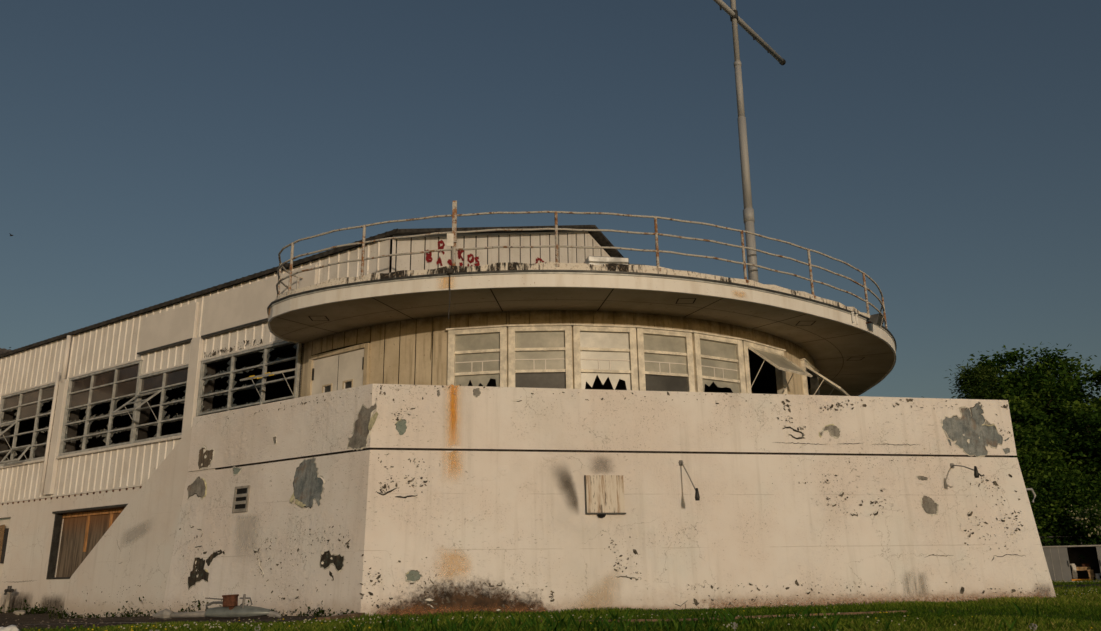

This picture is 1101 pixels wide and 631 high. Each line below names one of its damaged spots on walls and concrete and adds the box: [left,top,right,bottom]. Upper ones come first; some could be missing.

peeling [347,385,455,450]
peeling [746,393,867,439]
peeling [941,400,1012,458]
peeling [187,445,215,500]
peeling [289,457,325,509]
peeling [376,454,433,493]
spalling [920,496,939,516]
peeling [75,532,225,612]
peeling [251,526,350,615]
peeling [360,554,462,609]
peeling [478,582,555,613]